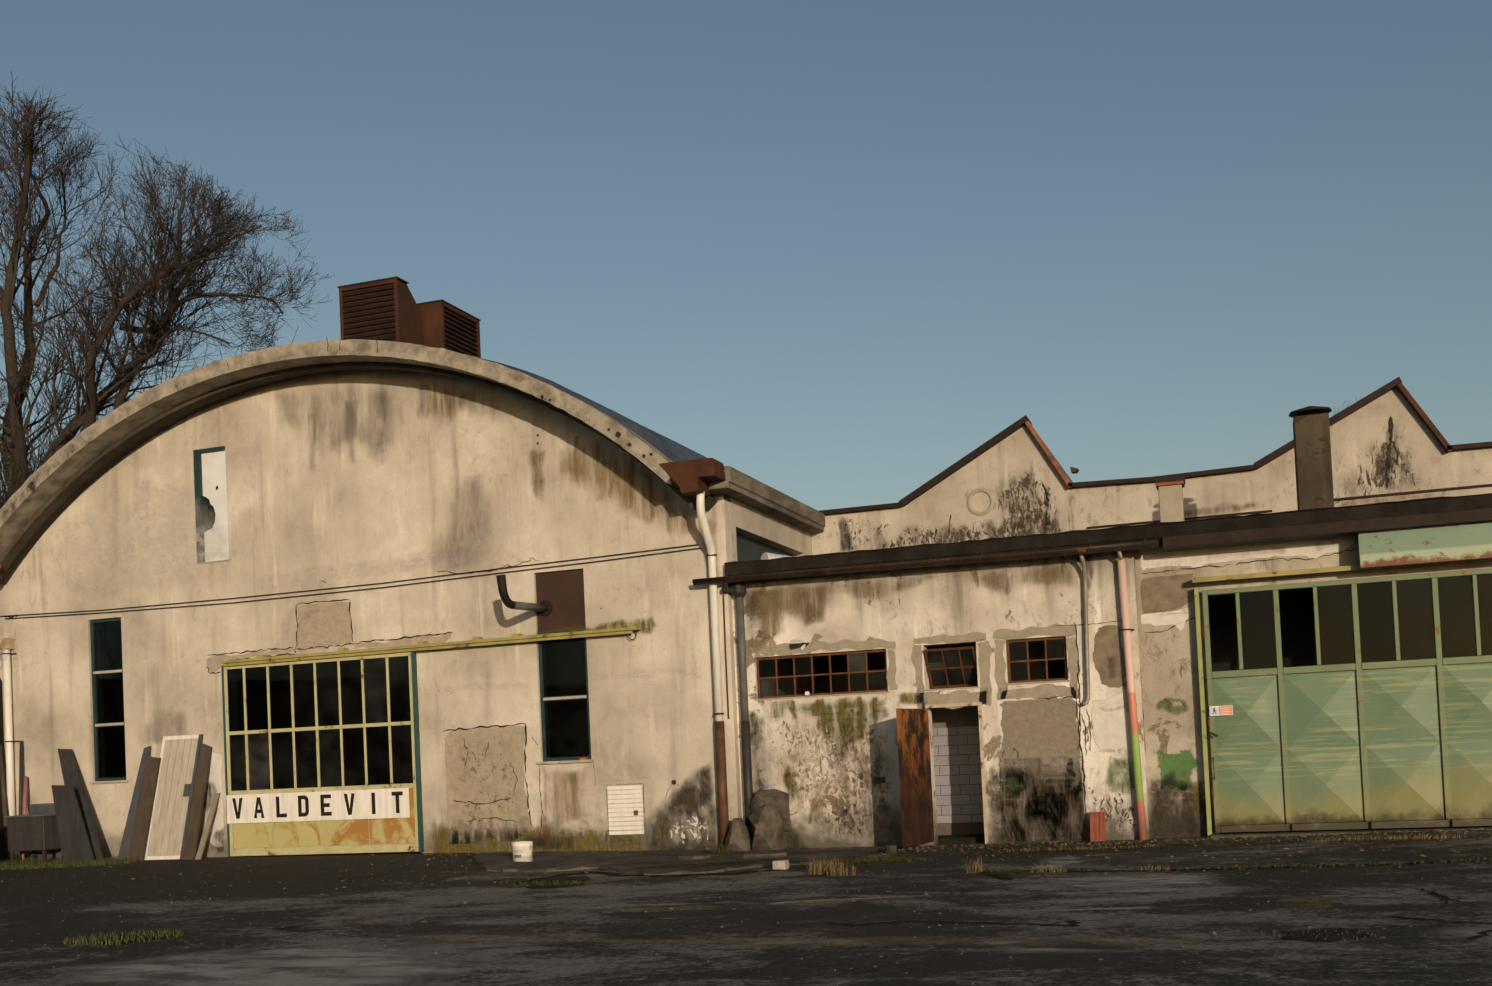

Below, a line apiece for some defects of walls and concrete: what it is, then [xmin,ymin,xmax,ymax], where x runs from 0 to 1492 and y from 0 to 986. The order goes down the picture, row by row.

water stain [532,452,542,492]
water stain [569,440,687,525]
flaking render [206,599,453,674]
water stain [750,712,763,753]
water stain [816,697,877,735]
flaking render [445,723,532,844]
water stain [649,768,717,850]
water stain [988,769,1085,844]